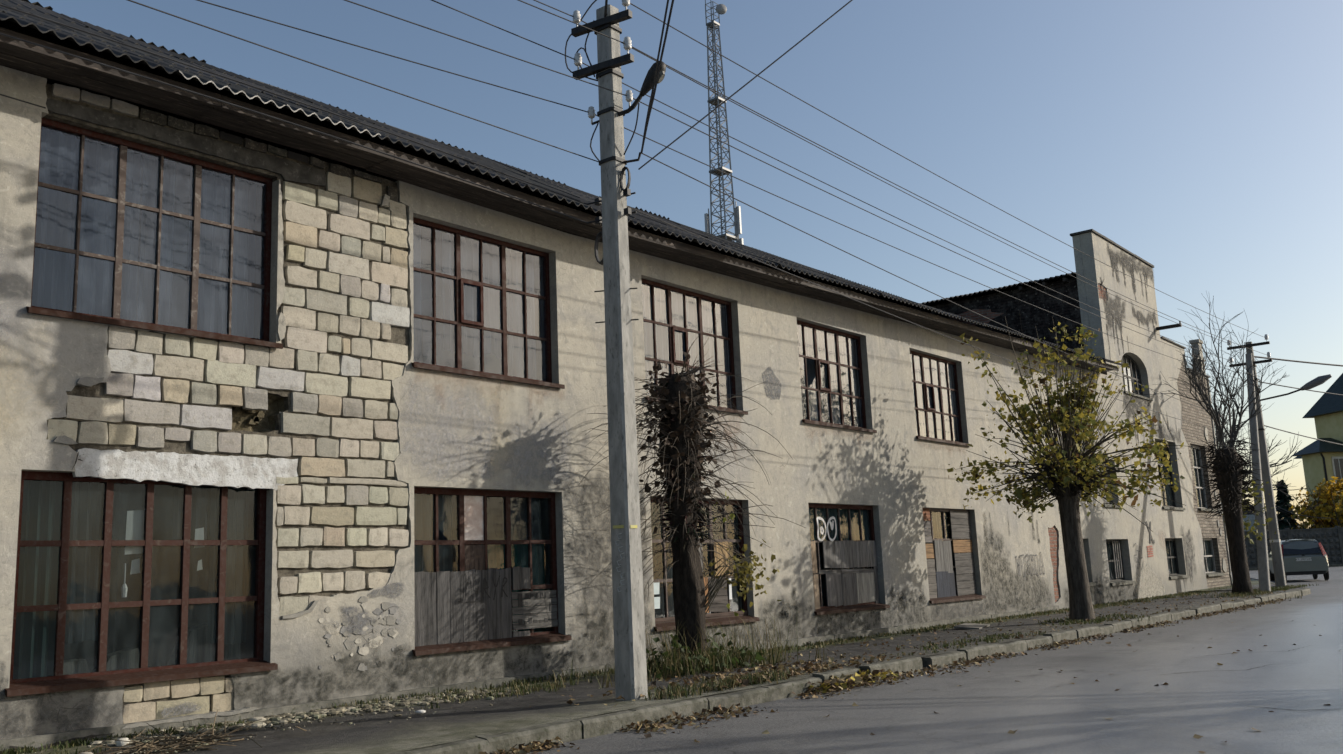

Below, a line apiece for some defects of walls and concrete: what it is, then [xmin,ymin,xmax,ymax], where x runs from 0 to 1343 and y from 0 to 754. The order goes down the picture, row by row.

leakage [1104,245,1157,358]
flaking render [42,83,410,671]
leakage [706,530,1048,647]
leakage [0,687,122,740]